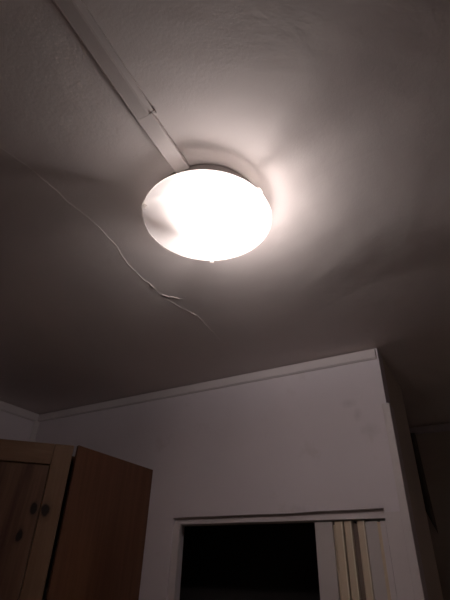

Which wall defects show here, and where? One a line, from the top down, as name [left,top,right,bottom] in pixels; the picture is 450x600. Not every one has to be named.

crack [0,147,224,344]